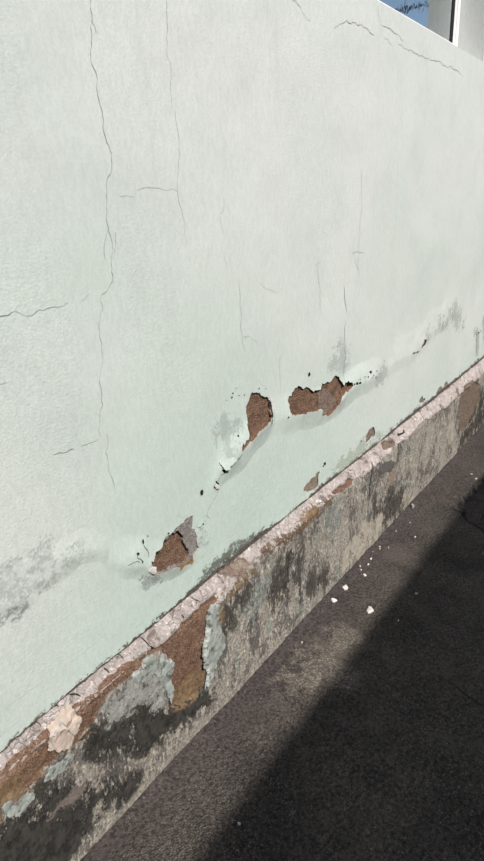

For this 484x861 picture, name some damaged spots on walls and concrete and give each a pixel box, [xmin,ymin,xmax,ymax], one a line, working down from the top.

crack [340,10,460,73]
crack [0,6,187,487]
flaking render [288,375,353,416]
flaking render [213,392,274,489]
flaking render [304,462,326,492]
flaking render [149,516,199,575]
flaking render [0,596,226,822]